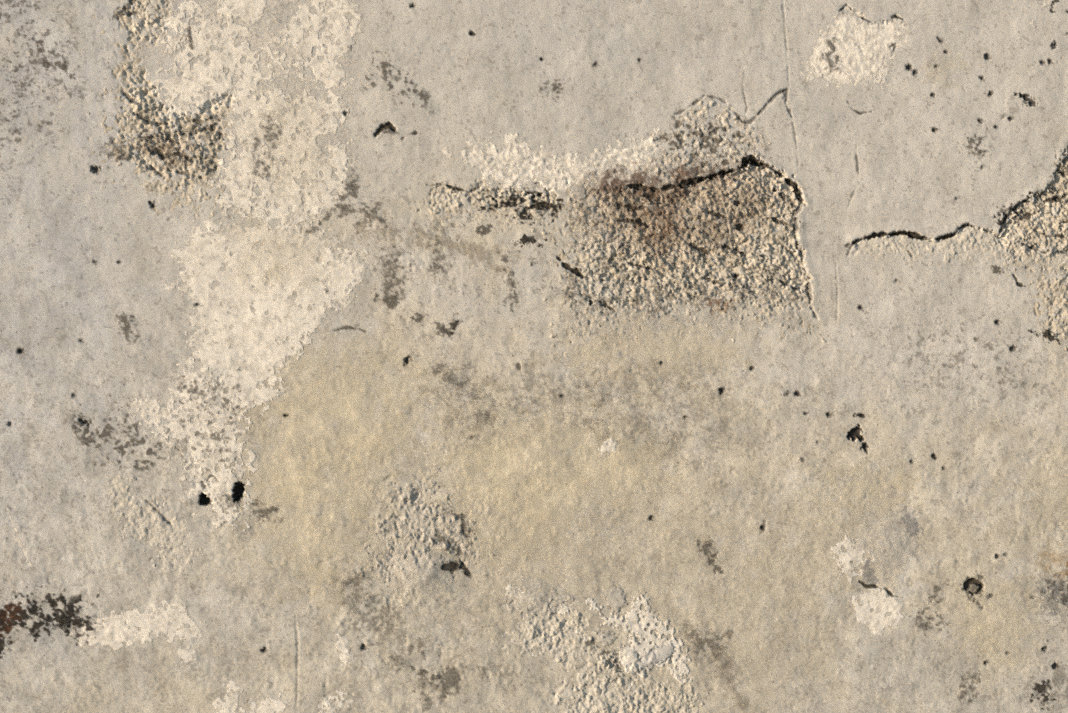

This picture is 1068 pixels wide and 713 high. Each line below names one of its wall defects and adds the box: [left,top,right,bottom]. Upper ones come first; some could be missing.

peeling [798,4,918,94]
peeling [1028,0,1068,28]
peeling [88,0,369,573]
flaking render [411,94,826,356]
crack [847,224,1026,287]
flaking render [994,149,1068,351]